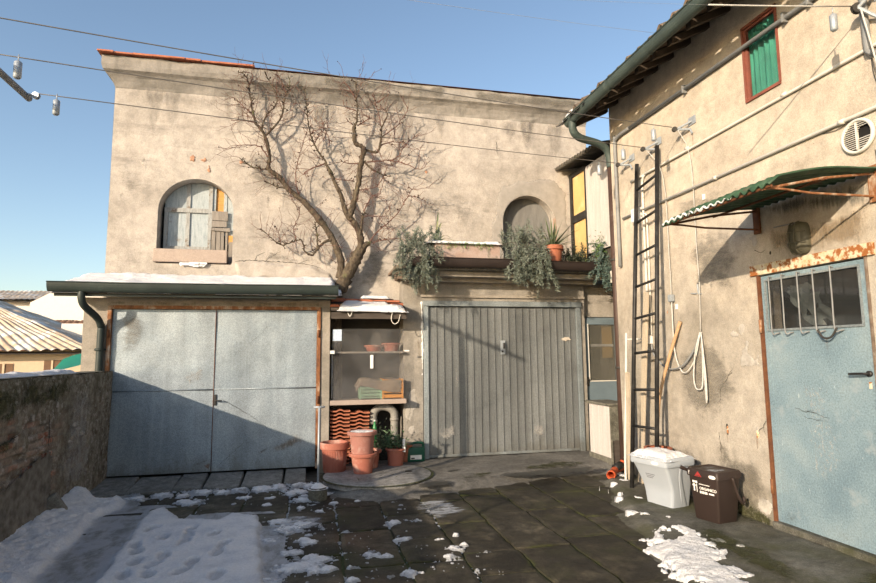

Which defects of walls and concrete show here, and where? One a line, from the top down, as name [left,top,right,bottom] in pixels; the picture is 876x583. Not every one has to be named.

leakage [688,353,719,406]
leakage [724,456,759,501]